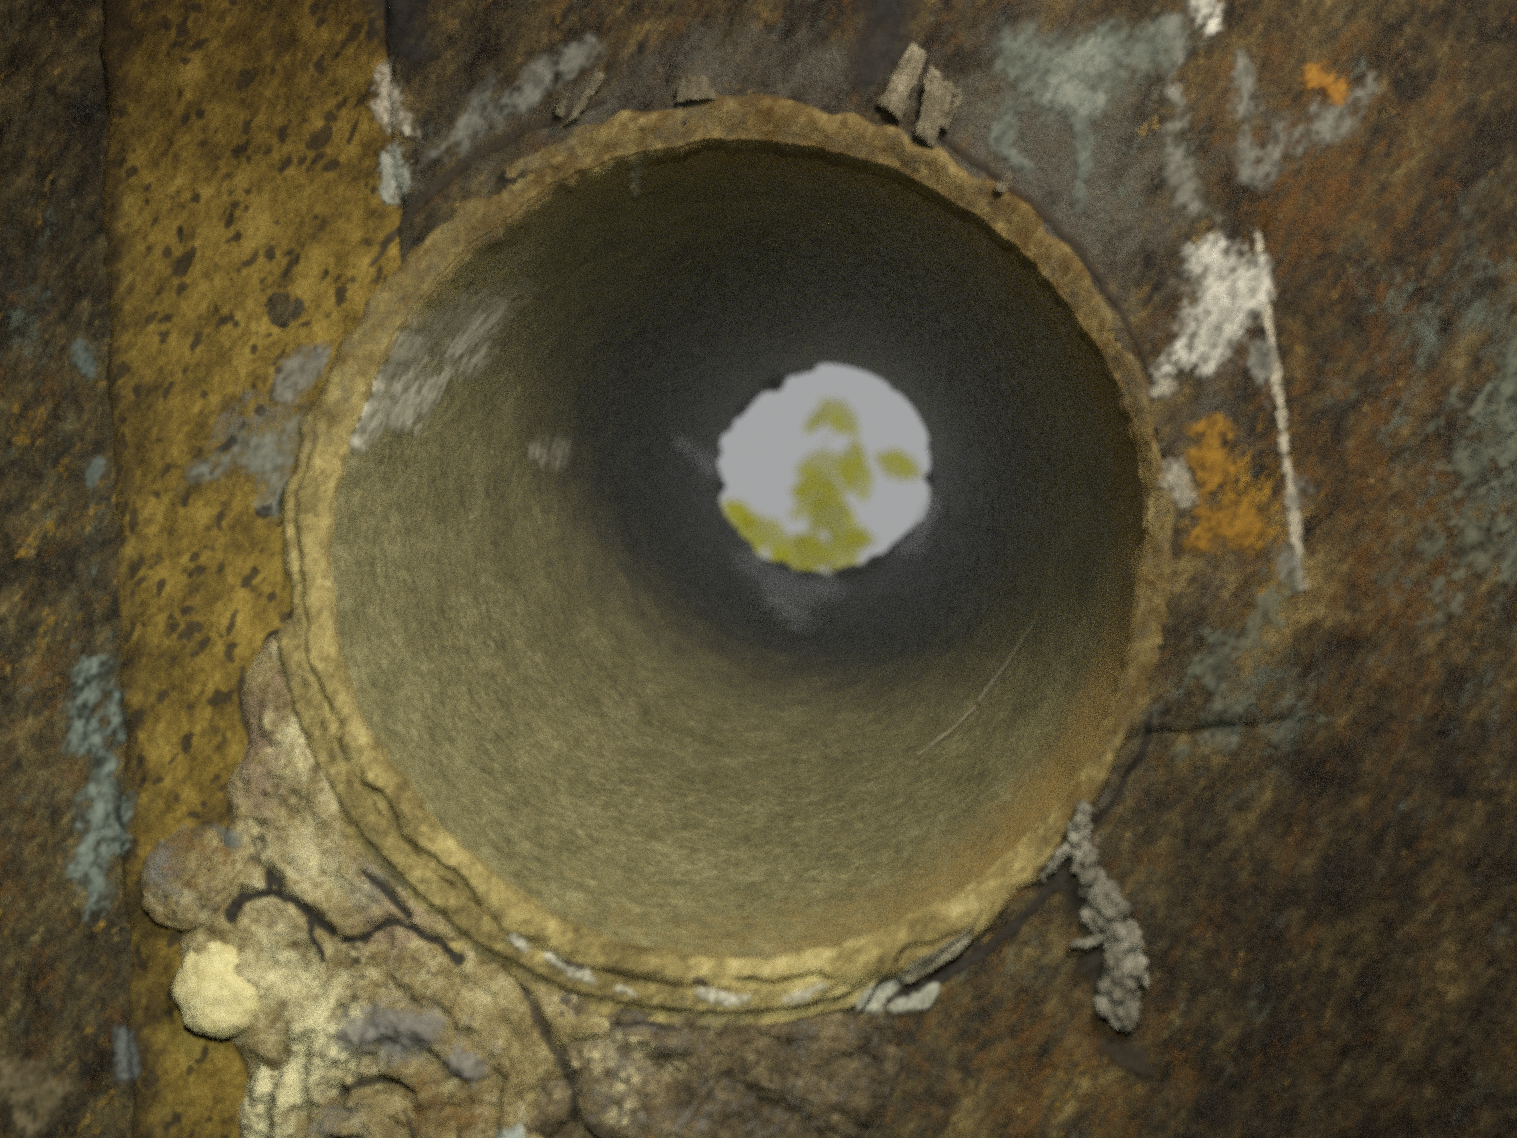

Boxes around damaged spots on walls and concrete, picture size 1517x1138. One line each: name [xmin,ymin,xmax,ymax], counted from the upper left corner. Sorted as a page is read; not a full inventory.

damp [457,37,594,140]
damp [990,0,1220,212]
damp [1235,54,1370,183]
rust [1304,62,1347,105]
damp [1150,232,1308,590]
rust [1186,413,1271,551]
damp [65,655,133,920]
crack [225,869,465,966]